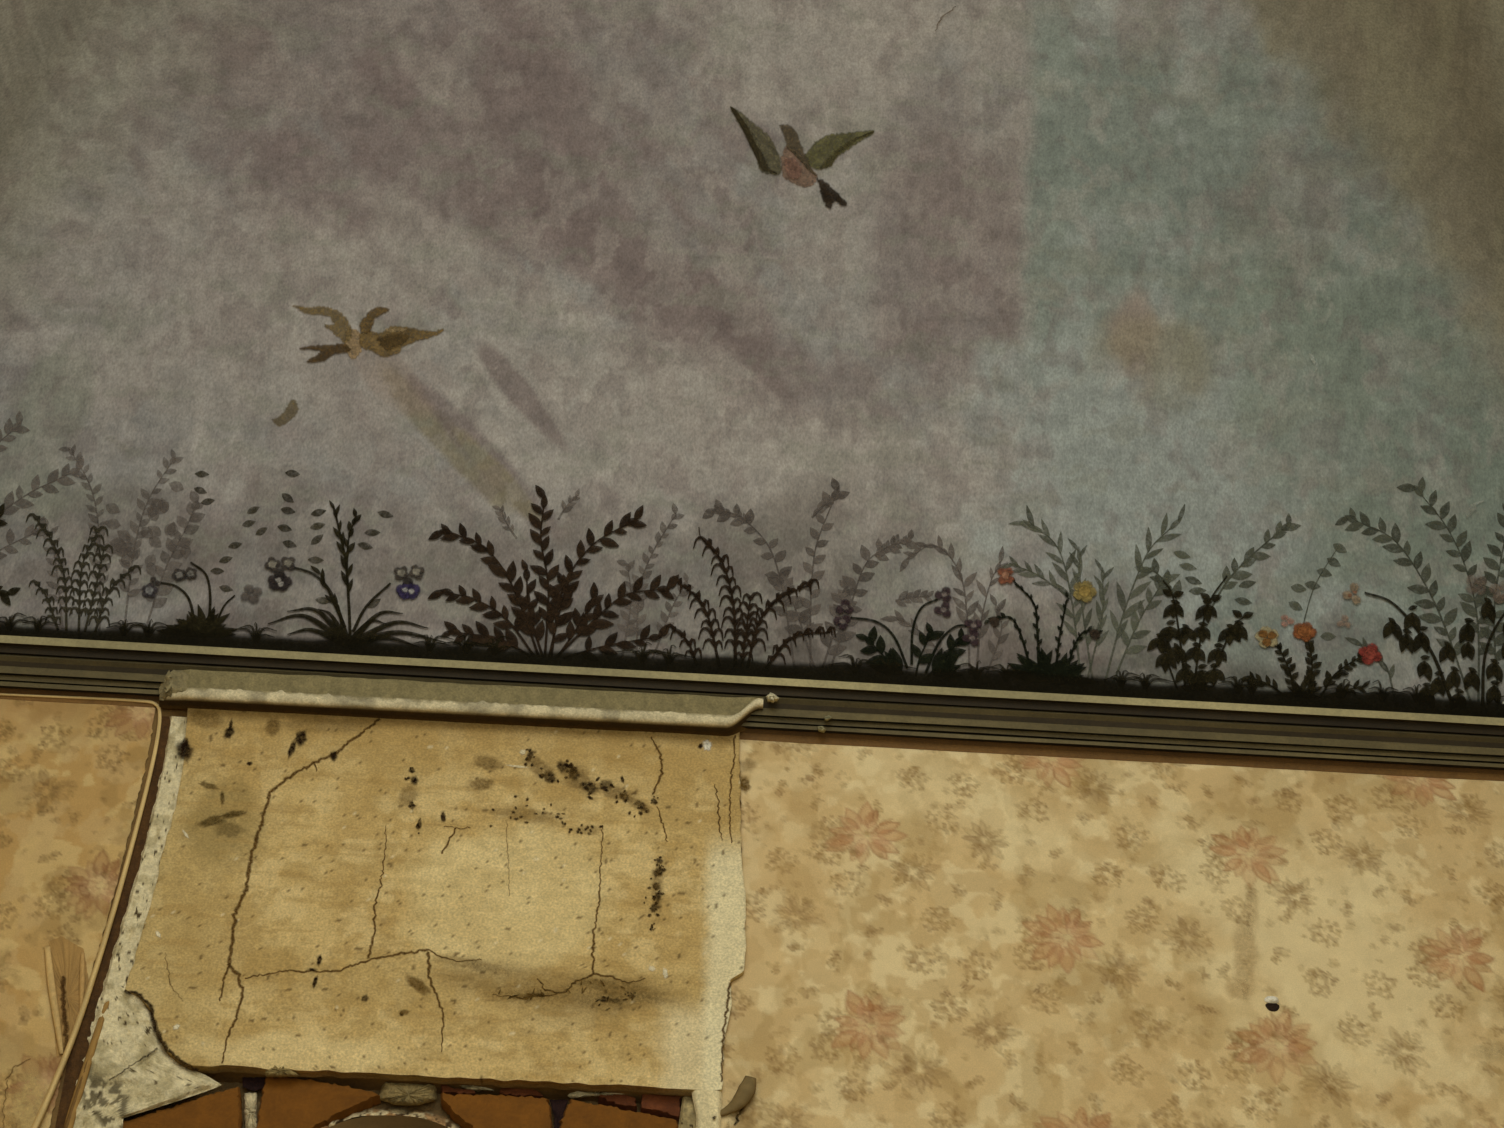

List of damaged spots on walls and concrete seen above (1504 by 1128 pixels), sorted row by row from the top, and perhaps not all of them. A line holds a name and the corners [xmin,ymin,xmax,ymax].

crack [109,718,481,1080]
flaking render [0,693,756,1128]
crack [441,826,510,895]
water stain [490,795,603,834]
crack [493,825,645,999]
water stain [524,749,659,817]
water stain [644,856,666,930]
crack [651,737,668,842]